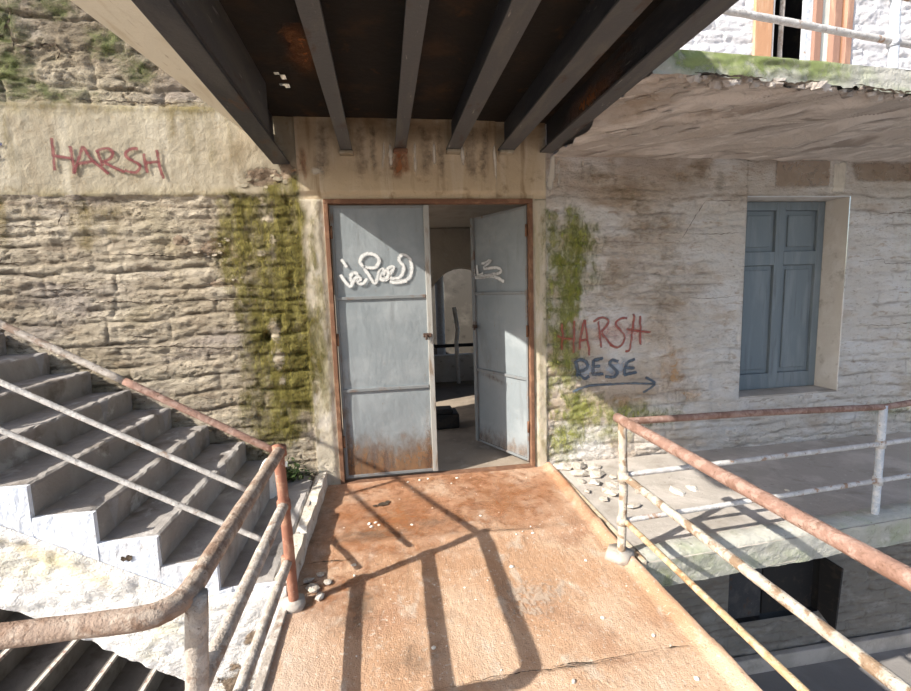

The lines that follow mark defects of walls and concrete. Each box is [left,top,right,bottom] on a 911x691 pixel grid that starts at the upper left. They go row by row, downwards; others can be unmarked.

crack [0,0,93,59]
spalling [625,72,911,115]
corrosion [347,441,433,483]
corrosion [341,497,437,552]
crack [435,645,690,691]